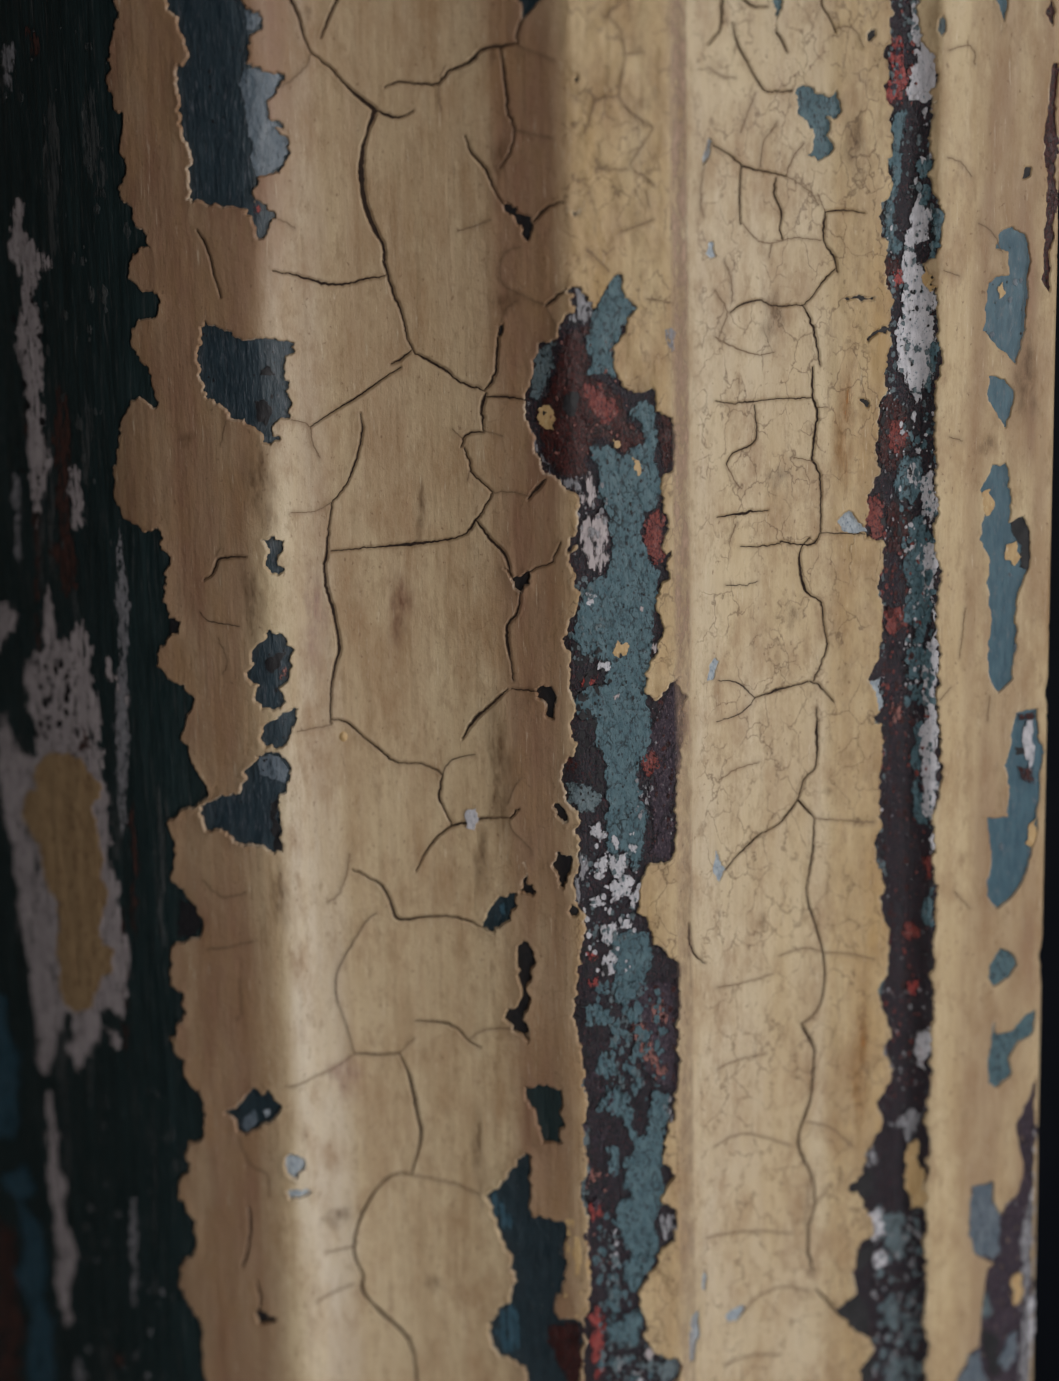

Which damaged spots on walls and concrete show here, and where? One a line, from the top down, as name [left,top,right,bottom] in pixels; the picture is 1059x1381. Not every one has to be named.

peeling [0,0,297,1381]
crack [197,231,221,297]
crack [200,549,245,674]
crack [276,0,565,871]
peeling [483,274,700,1381]
crack [579,0,655,232]
crack [688,0,875,1313]
peeling [834,0,946,1381]
peeling [980,463,1030,692]
peeling [986,709,1045,907]
crack [291,853,511,1381]
peeling [956,1081,1038,1381]